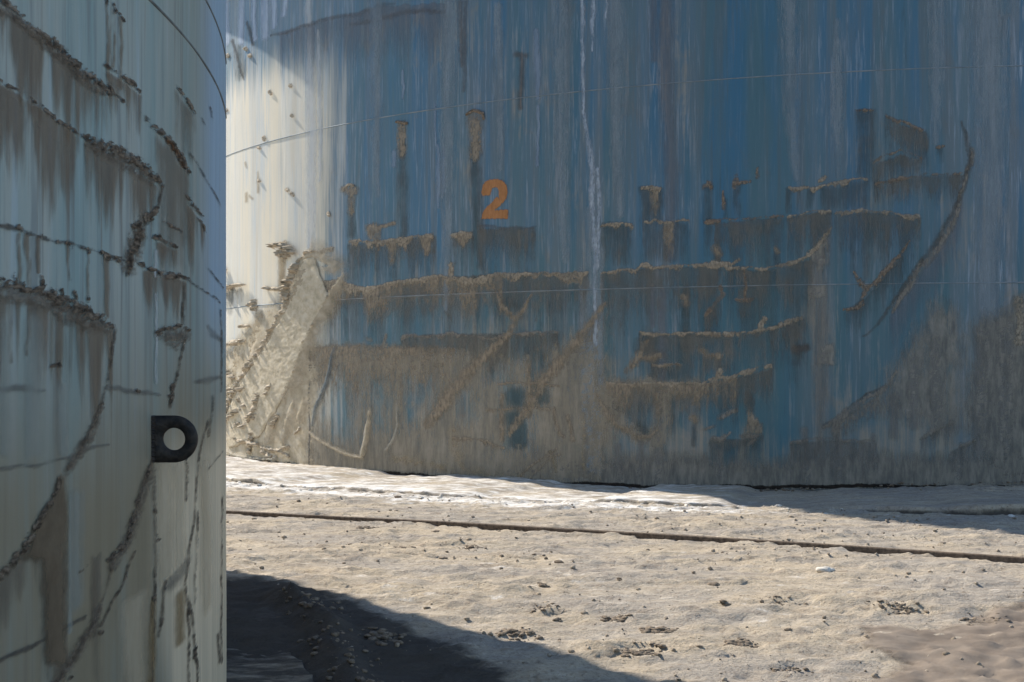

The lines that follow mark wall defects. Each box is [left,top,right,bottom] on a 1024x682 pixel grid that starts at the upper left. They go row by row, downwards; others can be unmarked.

crack [0,187,163,470]
damp [77,320,113,415]
damp [0,13,204,254]
crack [155,271,224,408]
peeling [323,185,832,424]
damp [580,0,626,272]
peeling [703,167,920,225]
crack [843,151,975,312]
crack [0,403,224,682]